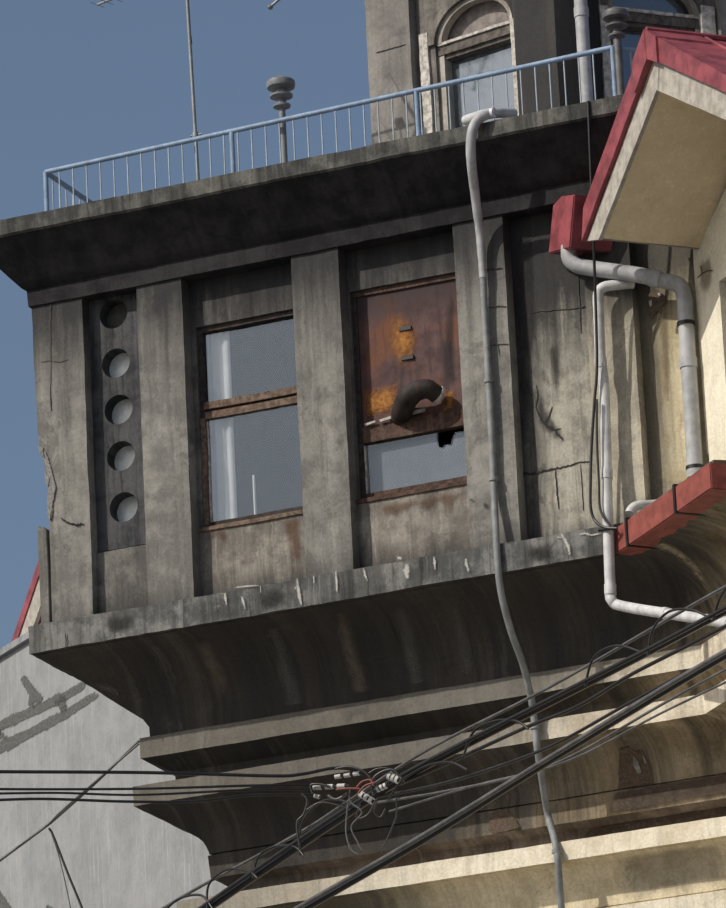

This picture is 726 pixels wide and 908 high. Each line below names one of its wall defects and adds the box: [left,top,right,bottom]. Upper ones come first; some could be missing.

crack [45,303,66,407]
rust [394,322,413,357]
rust [368,389,395,413]
crack [535,386,563,440]
crack [523,461,590,511]
spalling [37,446,56,624]